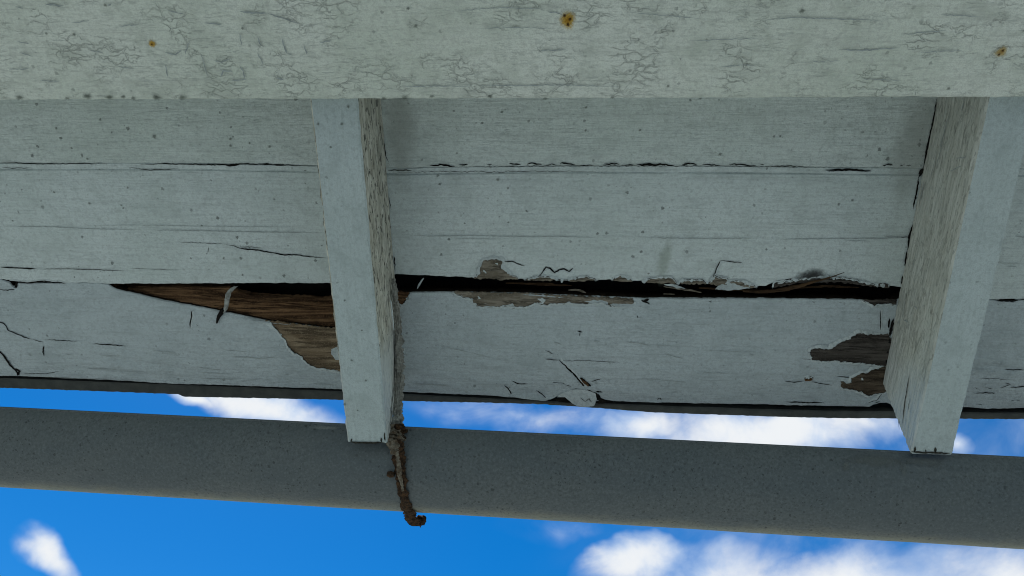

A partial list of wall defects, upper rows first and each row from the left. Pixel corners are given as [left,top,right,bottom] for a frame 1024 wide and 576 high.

crack [165,11,330,81]
corrosion [561,13,573,28]
crack [638,13,880,41]
crack [800,14,980,63]
crack [0,161,90,169]
crack [130,163,302,171]
peeling [216,286,238,324]
peeling [452,255,636,310]
crack [384,99,966,424]
crack [0,322,122,379]
peeling [246,317,340,374]
peeling [807,329,891,398]